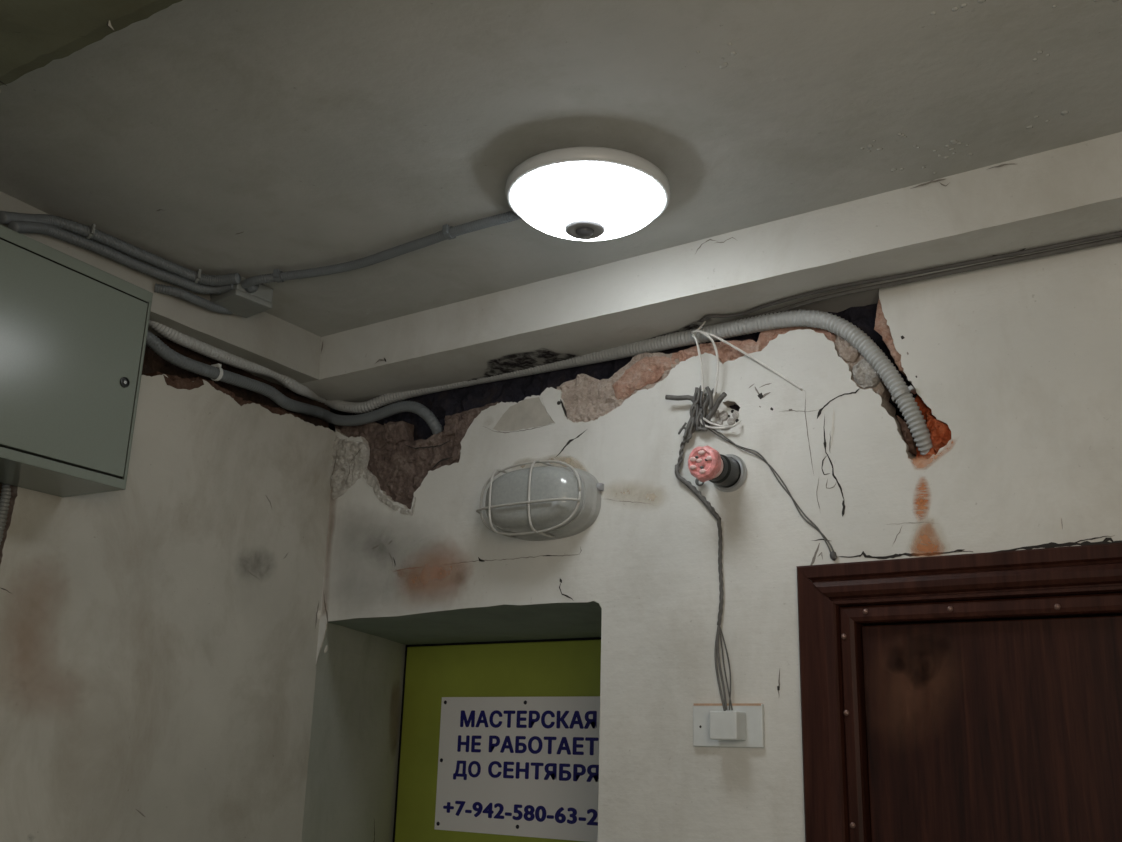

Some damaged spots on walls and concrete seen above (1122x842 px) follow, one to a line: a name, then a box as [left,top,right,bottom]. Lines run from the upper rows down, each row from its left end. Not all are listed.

spalling [874,299,917,378]
spalling [334,326,891,516]
crack [782,389,859,517]
corrosion [915,483,938,554]